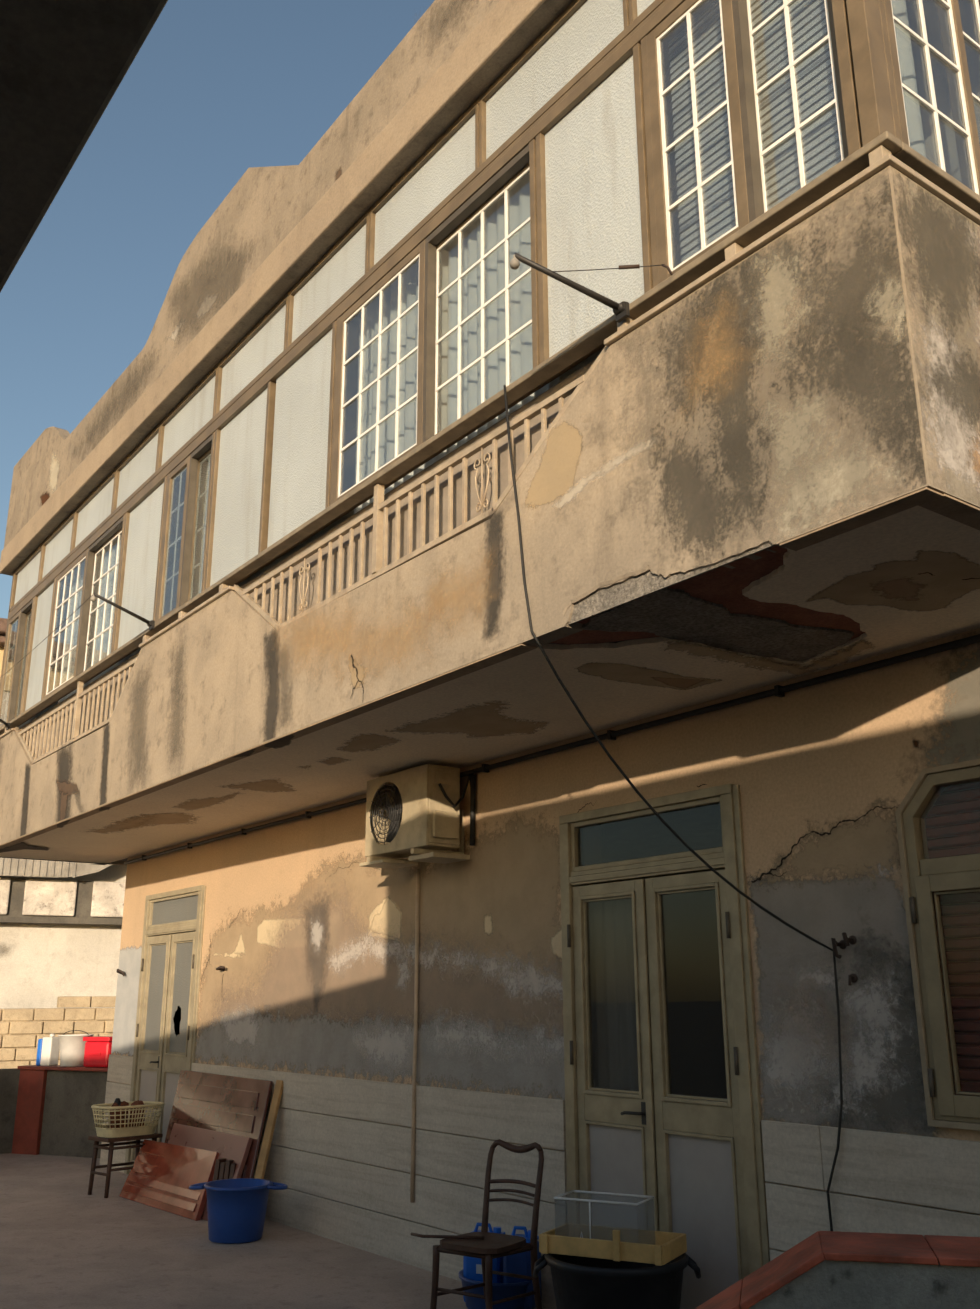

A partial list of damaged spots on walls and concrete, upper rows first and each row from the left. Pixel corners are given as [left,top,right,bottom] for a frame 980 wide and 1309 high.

water stain [650,181,980,558]
flaking render [525,421,657,508]
water stain [485,511,503,636]
flaking render [551,541,980,662]
water stain [264,630,279,741]
crack [349,655,365,696]
peeling [302,700,548,769]
peeling [574,662,722,690]
peeling [85,779,297,834]
crack [752,800,901,885]
peeling [197,816,564,1039]
water stain [220,900,563,1030]